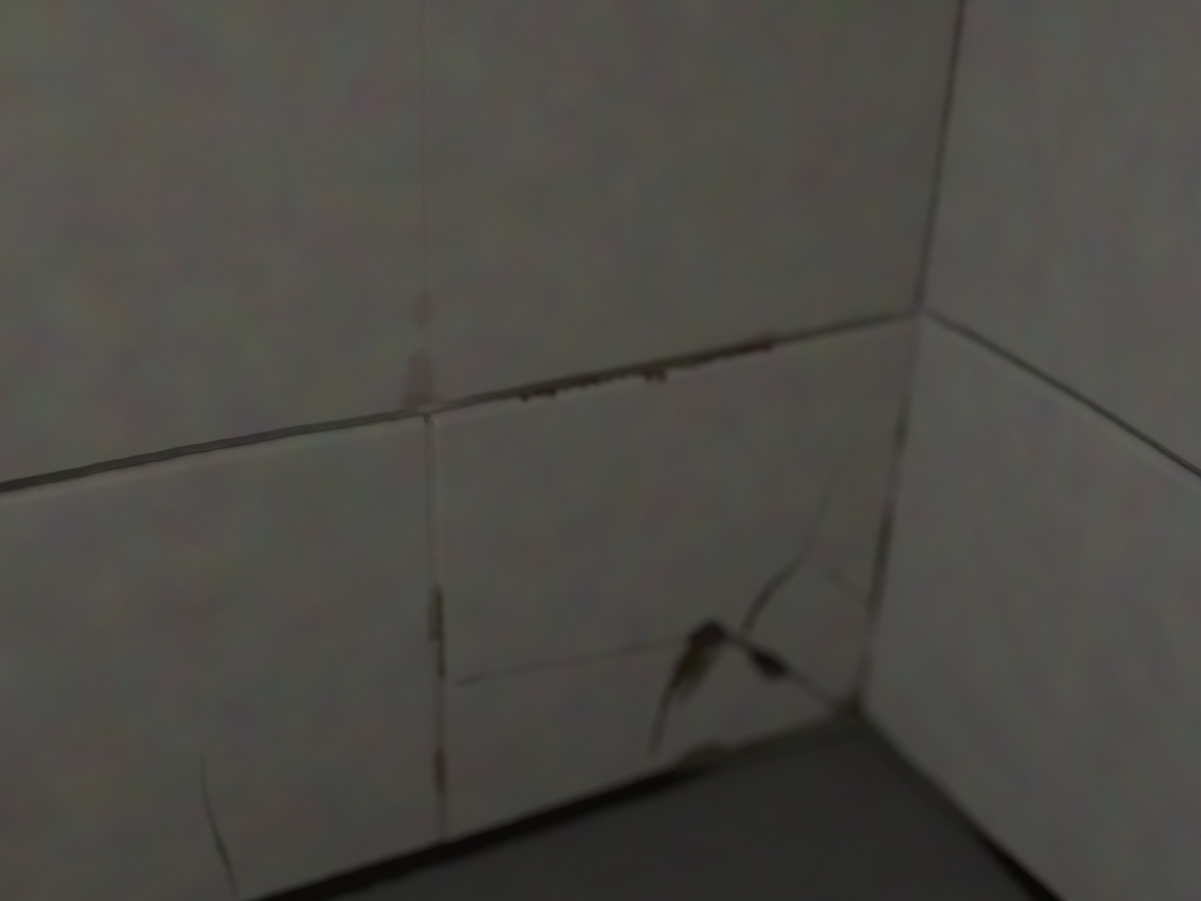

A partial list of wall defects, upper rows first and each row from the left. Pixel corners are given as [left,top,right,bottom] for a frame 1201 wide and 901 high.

crack [728,558,803,653]